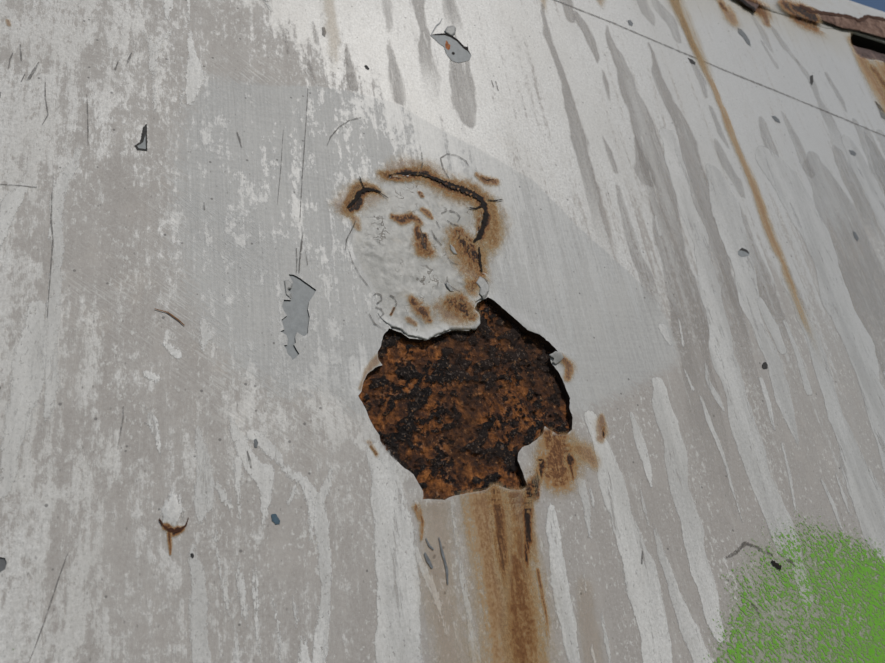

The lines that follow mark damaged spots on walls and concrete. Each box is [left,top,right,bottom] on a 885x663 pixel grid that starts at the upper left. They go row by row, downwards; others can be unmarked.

peeling [135,124,148,151]
peeling [430,18,472,63]
corrosion [671,0,805,322]
corrosion [717,0,824,34]
corrosion [848,36,885,112]
peeling [281,274,316,360]
leakage [658,128,885,608]
corrosion [162,523,185,555]
leakage [366,440,481,663]
corrosion [462,414,607,663]
leakage [545,502,580,663]
leakage [577,377,725,663]